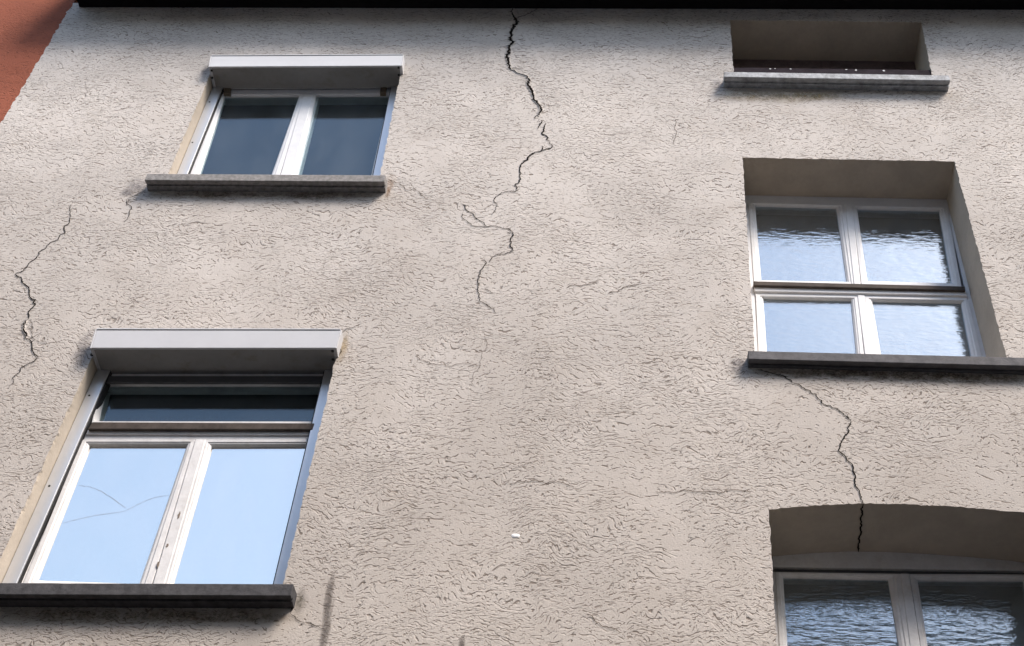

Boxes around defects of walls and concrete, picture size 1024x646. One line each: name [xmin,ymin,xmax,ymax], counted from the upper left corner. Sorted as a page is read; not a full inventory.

crack [460,8,553,384]
crack [12,208,71,384]
crack [762,370,864,552]